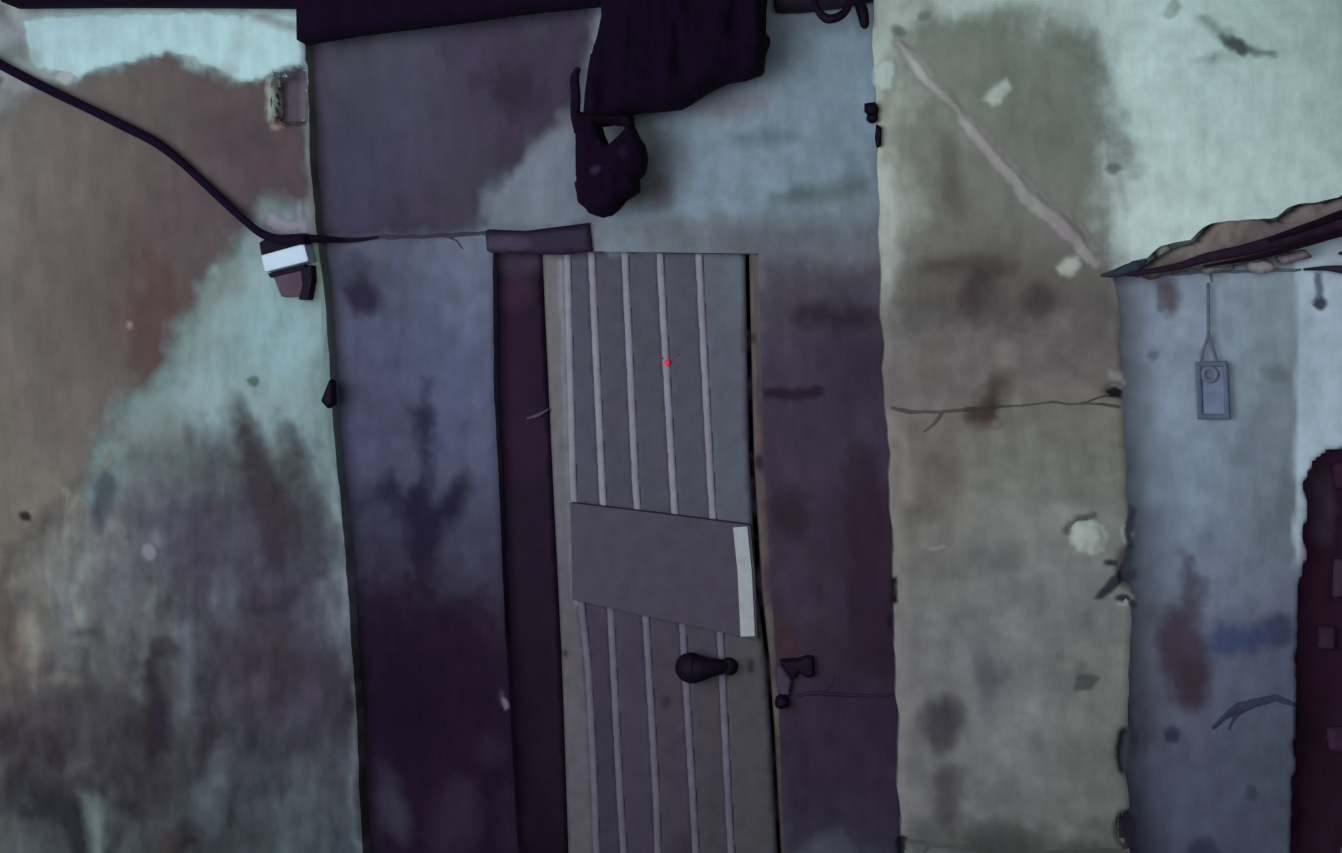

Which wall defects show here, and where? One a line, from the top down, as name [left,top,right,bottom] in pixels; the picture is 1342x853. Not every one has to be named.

flaking render [984,78,1011,106]
water stain [0,9,590,579]
crack [891,395,1120,432]
water stain [181,425,349,731]
corrosion [1160,580,1205,702]
crack [1211,694,1296,730]
water stain [25,796,104,853]